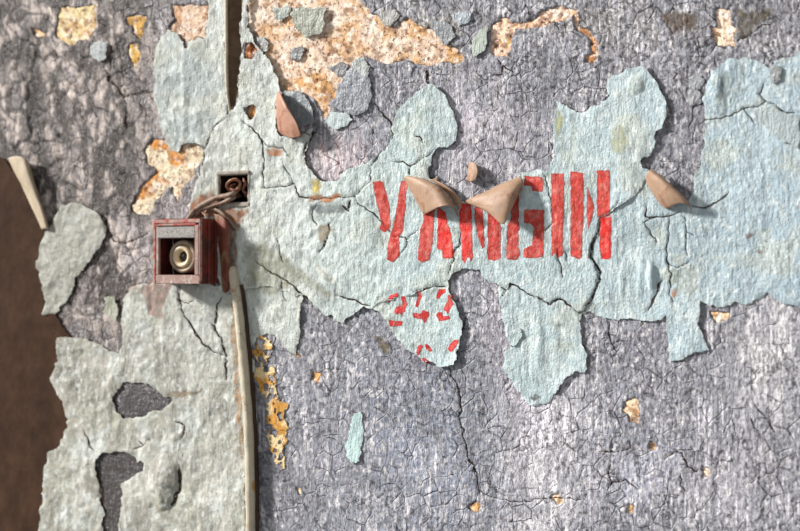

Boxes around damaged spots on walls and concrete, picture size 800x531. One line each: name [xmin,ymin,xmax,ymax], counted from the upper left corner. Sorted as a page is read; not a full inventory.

peeling [132,0,800,471]
peeling [0,156,246,531]
crack [178,286,227,380]
crack [450,370,582,505]
crack [600,443,637,490]
crack [665,446,704,490]